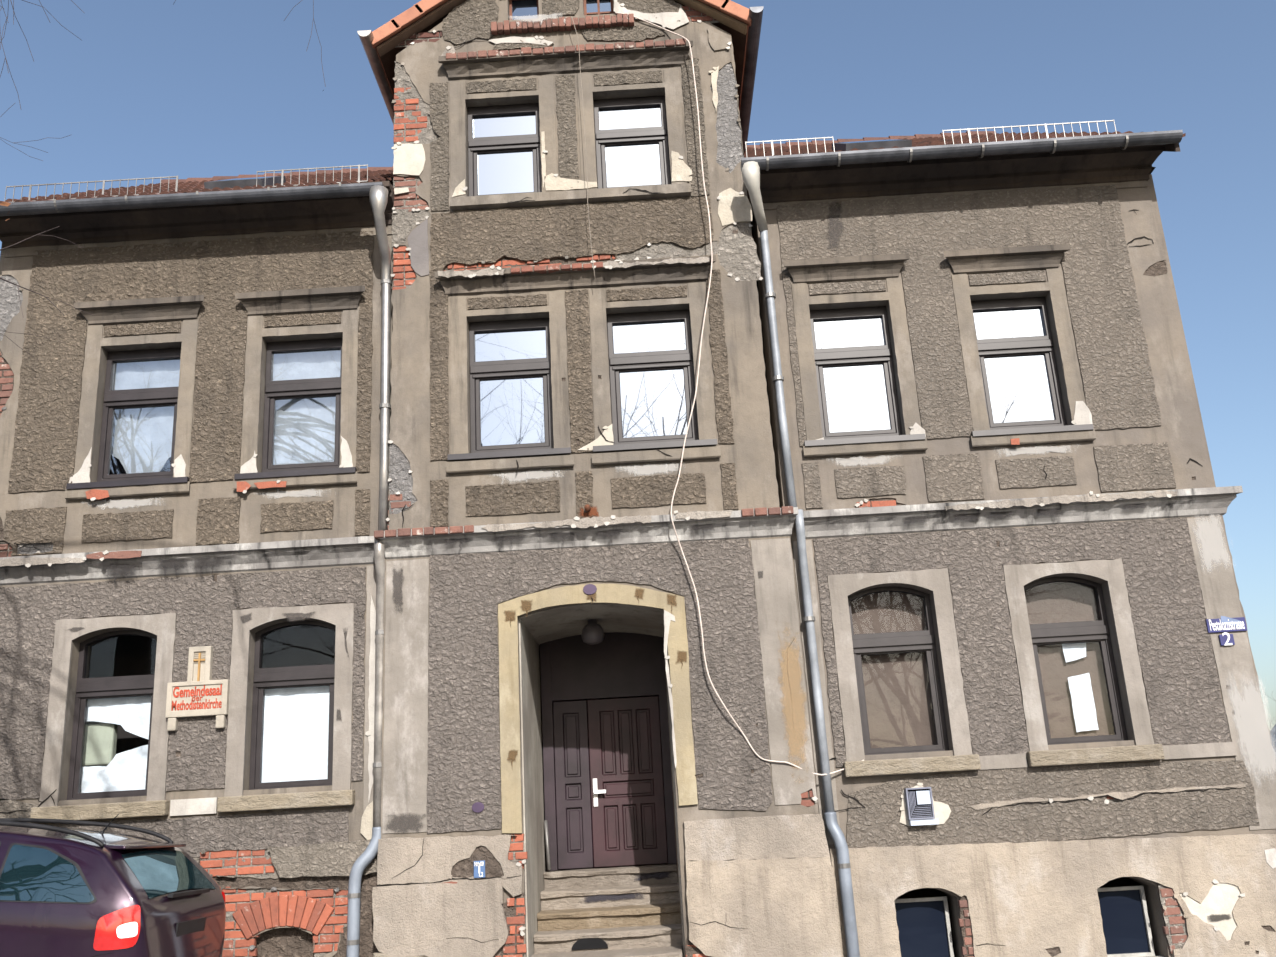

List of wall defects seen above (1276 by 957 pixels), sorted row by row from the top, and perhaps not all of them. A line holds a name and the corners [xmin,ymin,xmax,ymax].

flaking render [391,0,745,173]
flaking render [452,179,467,197]
flaking render [541,131,597,191]
flaking render [671,151,692,182]
flaking render [391,176,431,290]
flaking render [0,275,23,416]
flaking render [85,489,109,501]
flaking render [0,517,142,567]
flaking render [445,834,528,884]
flaking render [200,847,379,957]
flaking render [495,892,527,957]
flaking render [1158,879,1258,954]